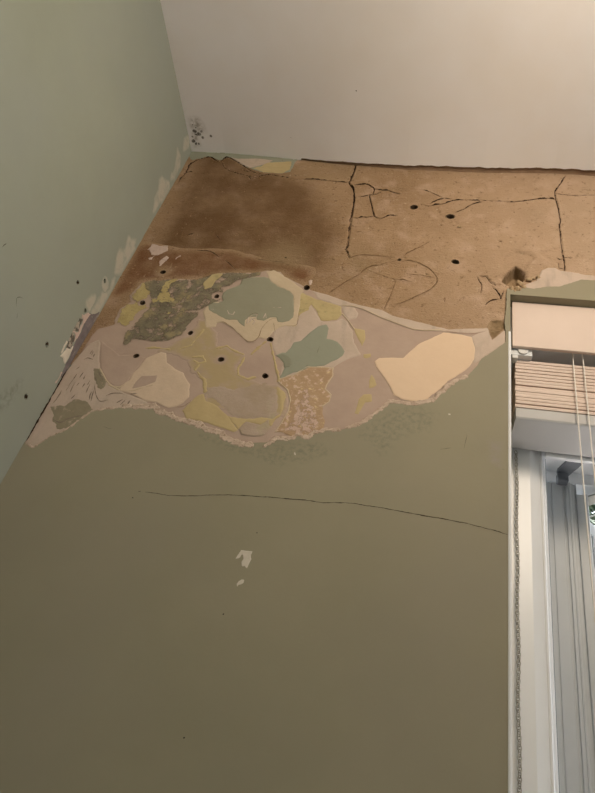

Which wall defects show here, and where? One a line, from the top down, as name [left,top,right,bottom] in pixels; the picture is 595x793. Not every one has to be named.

damp [71,114,360,365]
crack [425,190,486,212]
crack [510,177,583,271]
peeling [25,157,595,448]
peeling [236,550,252,568]
crack [227,494,508,535]